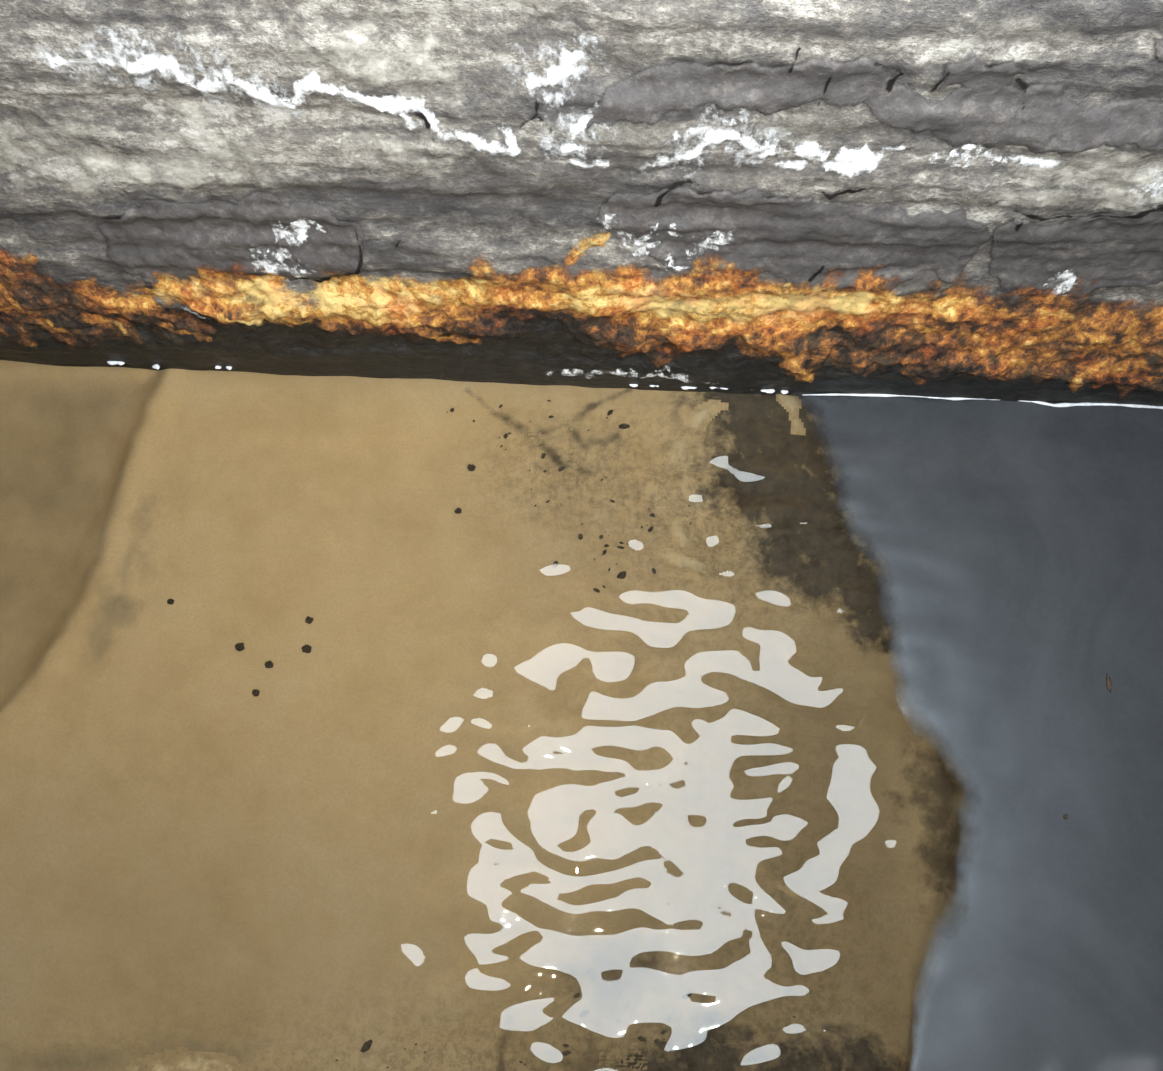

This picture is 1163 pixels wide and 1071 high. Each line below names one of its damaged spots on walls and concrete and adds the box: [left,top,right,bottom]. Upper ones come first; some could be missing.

damp [528,35,596,101]
damp [0,16,521,198]
damp [541,115,609,168]
damp [652,111,905,177]
crack [1014,207,1163,231]
corrosion [0,233,1163,399]